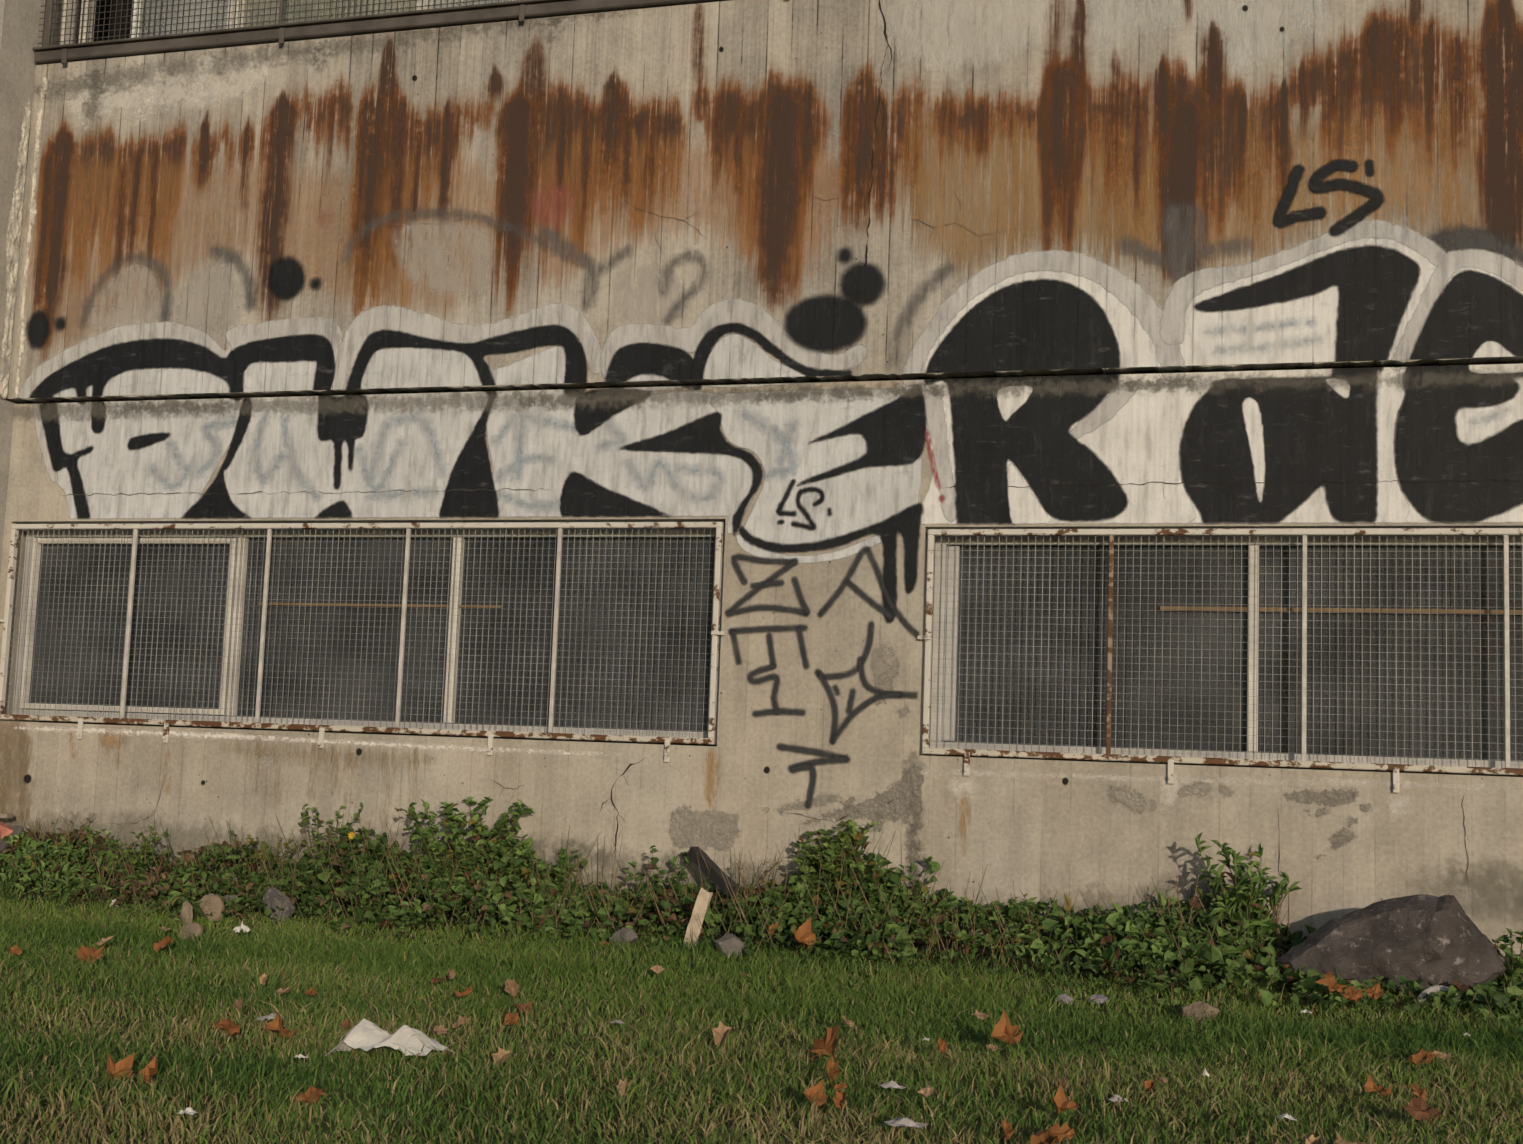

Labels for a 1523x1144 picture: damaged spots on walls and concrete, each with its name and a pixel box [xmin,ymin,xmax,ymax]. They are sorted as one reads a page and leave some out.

rust [33,0,1523,345]
crack [816,0,892,264]
crack [600,757,646,852]